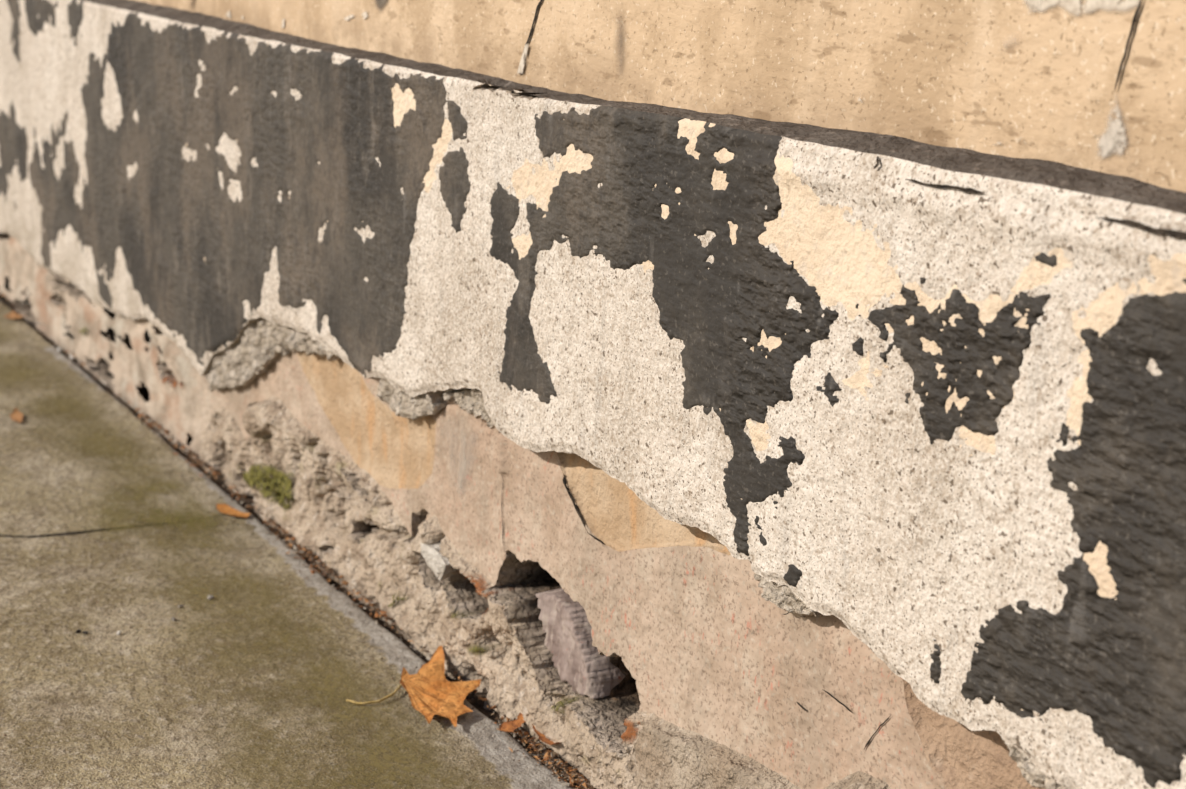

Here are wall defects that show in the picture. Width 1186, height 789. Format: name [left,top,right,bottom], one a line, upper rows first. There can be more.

crack [519,0,542,74]
crack [1114,0,1142,92]
peeling [677,118,715,160]
peeling [1098,106,1126,157]
flaking render [0,0,602,722]
crack [0,514,224,537]
crack [557,460,605,545]
peeling [482,136,1186,789]